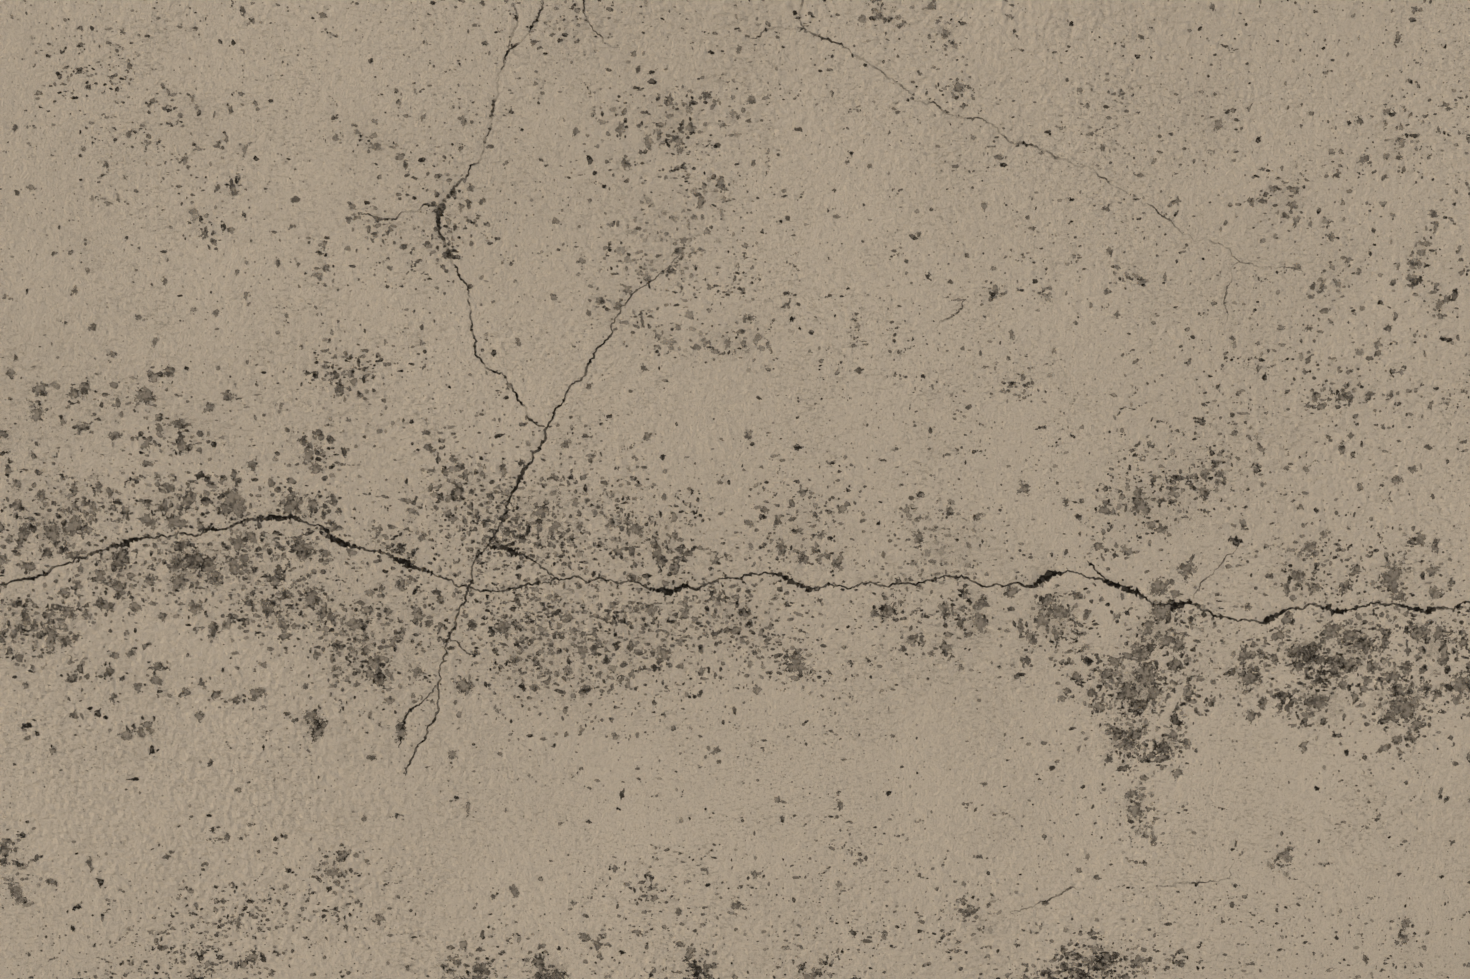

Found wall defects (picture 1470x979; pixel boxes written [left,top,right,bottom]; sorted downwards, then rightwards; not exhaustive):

crack [0,7,1470,776]